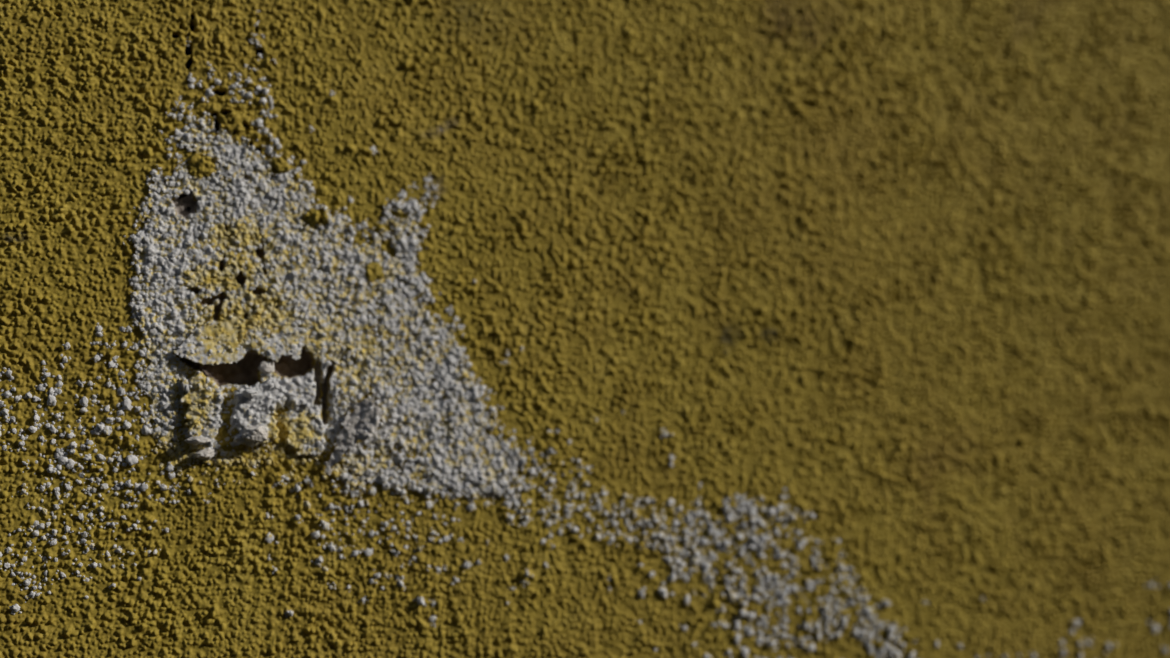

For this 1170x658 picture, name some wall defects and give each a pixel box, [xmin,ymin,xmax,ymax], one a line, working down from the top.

spalling [220,260,264,295]
flaking render [173,288,384,476]
leakage [0,10,917,658]
leakage [1058,619,1118,658]